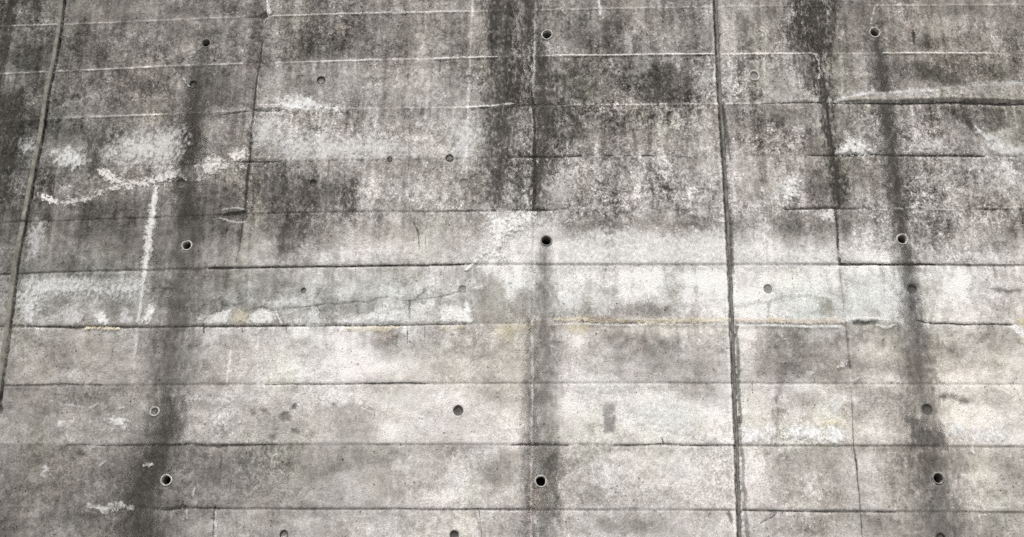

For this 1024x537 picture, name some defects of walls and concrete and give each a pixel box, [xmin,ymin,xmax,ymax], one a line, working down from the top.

damp [51,146,85,170]
damp [114,130,179,168]
damp [436,0,725,284]
damp [796,0,875,222]
damp [740,173,835,268]
crack [748,410,892,529]
damp [949,422,1007,453]